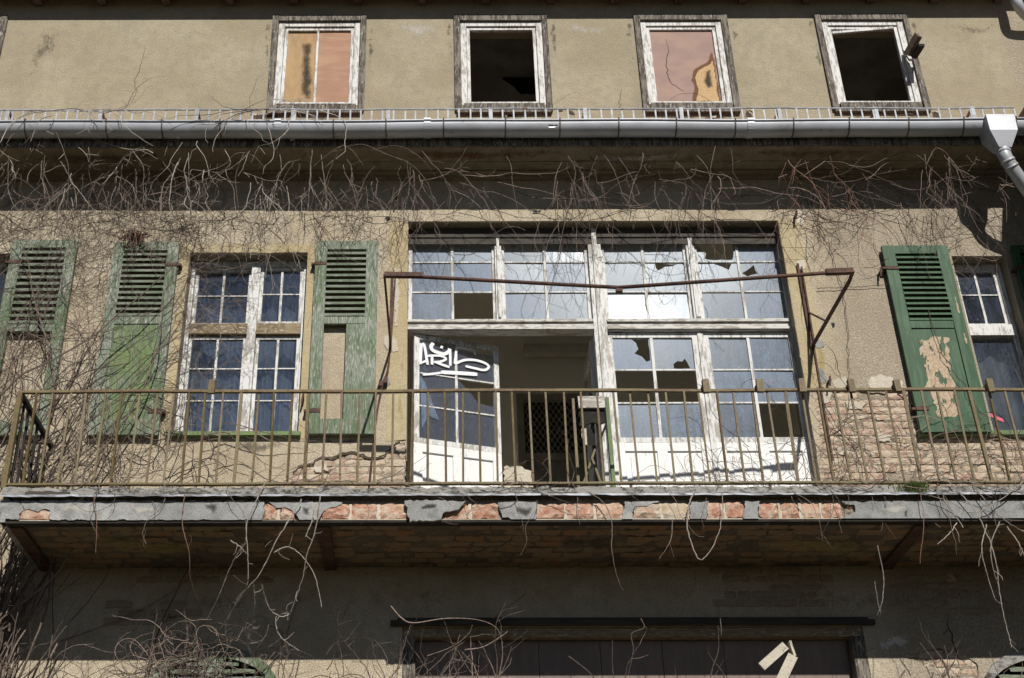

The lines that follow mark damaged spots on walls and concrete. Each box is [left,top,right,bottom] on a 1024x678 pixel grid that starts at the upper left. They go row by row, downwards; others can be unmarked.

peeling [919,336,958,417]
flaking render [707,375,1024,519]
flaking render [291,440,407,489]
spalling [19,507,50,521]
spalling [263,503,295,520]
spalling [322,502,407,520]
spalling [441,492,690,520]